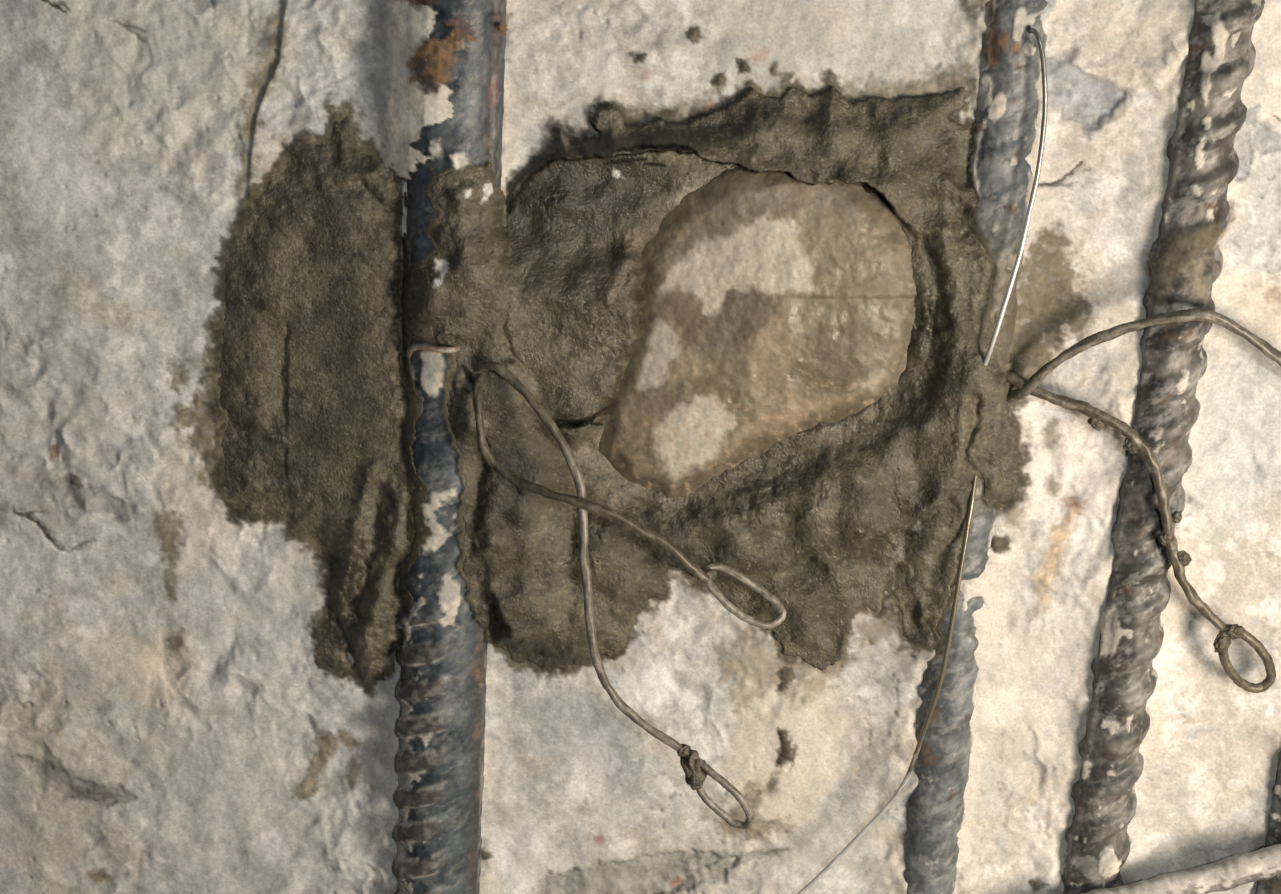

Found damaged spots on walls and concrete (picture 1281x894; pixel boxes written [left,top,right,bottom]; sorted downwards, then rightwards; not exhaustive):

spalling [1040,0,1055,22]
peeling [384,0,469,179]
corrosion [409,17,478,94]
spalling [1046,58,1124,138]
spalling [1236,106,1280,179]
crack [509,144,892,215]
spalling [537,851,779,894]